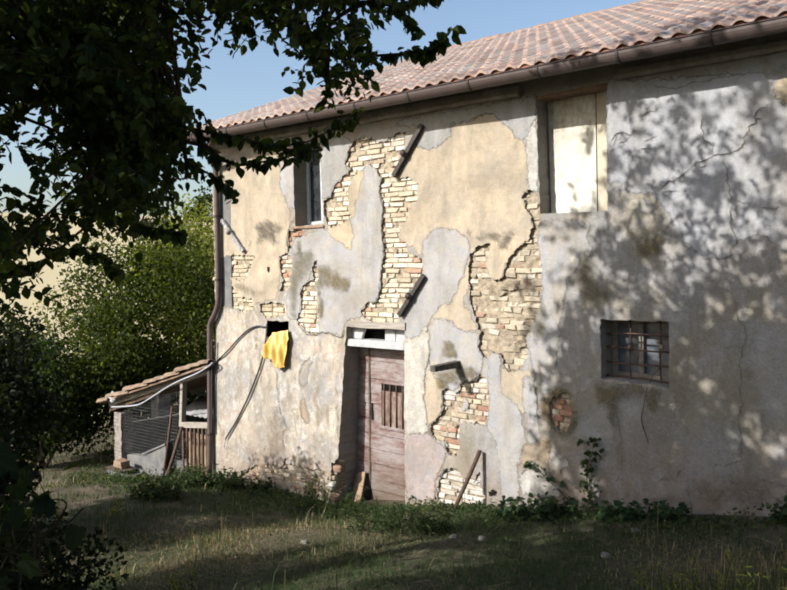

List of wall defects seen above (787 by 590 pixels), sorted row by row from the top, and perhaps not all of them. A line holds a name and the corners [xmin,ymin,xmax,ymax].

flaking render [774,76,787,104]
crack [611,110,653,149]
crack [653,102,773,251]
flaking render [212,151,305,319]
spalling [297,261,319,336]
flaking render [323,113,543,505]
spalling [549,393,573,433]
crack [713,294,748,474]
spalling [238,457,346,500]